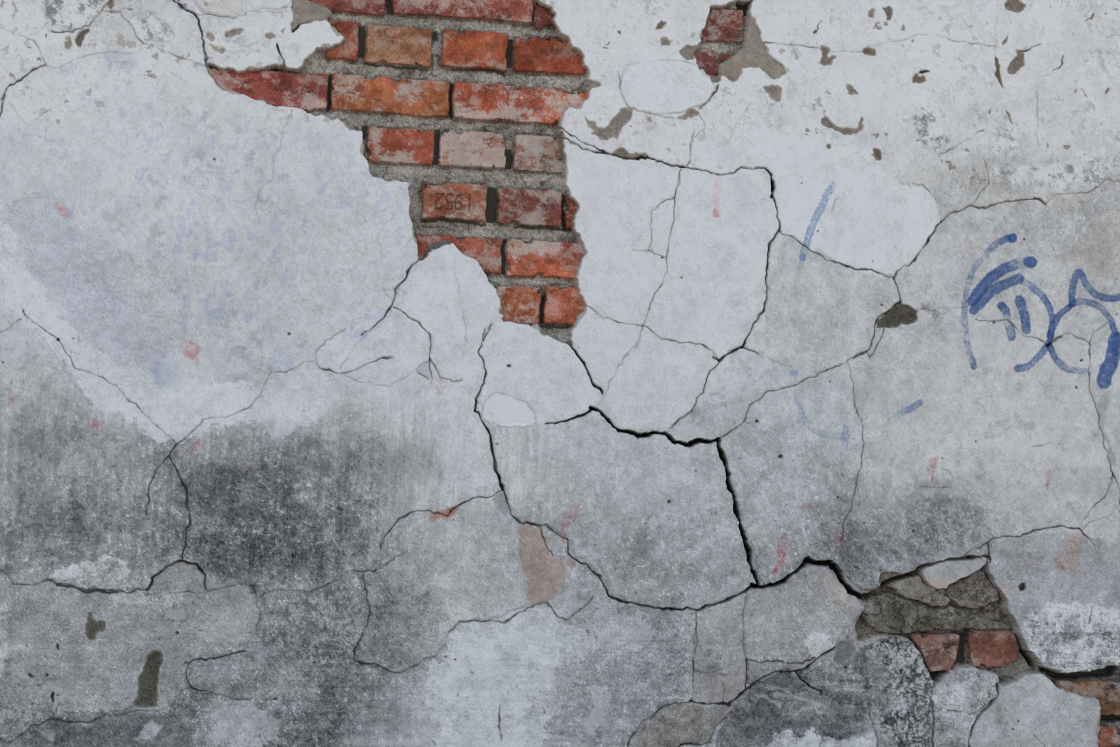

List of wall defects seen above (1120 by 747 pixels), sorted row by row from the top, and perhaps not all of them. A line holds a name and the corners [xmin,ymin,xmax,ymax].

crack [0,0,291,128]
crack [618,74,674,120]
spalling [655,1,788,103]
peeling [995,37,1025,89]
spalling [206,0,649,347]
crack [1030,179,1120,206]
peeling [876,303,918,329]
water stain [0,386,440,598]
crack [0,112,1026,747]
crack [914,307,1120,563]
water stain [307,664,416,747]
spalling [833,555,1120,747]